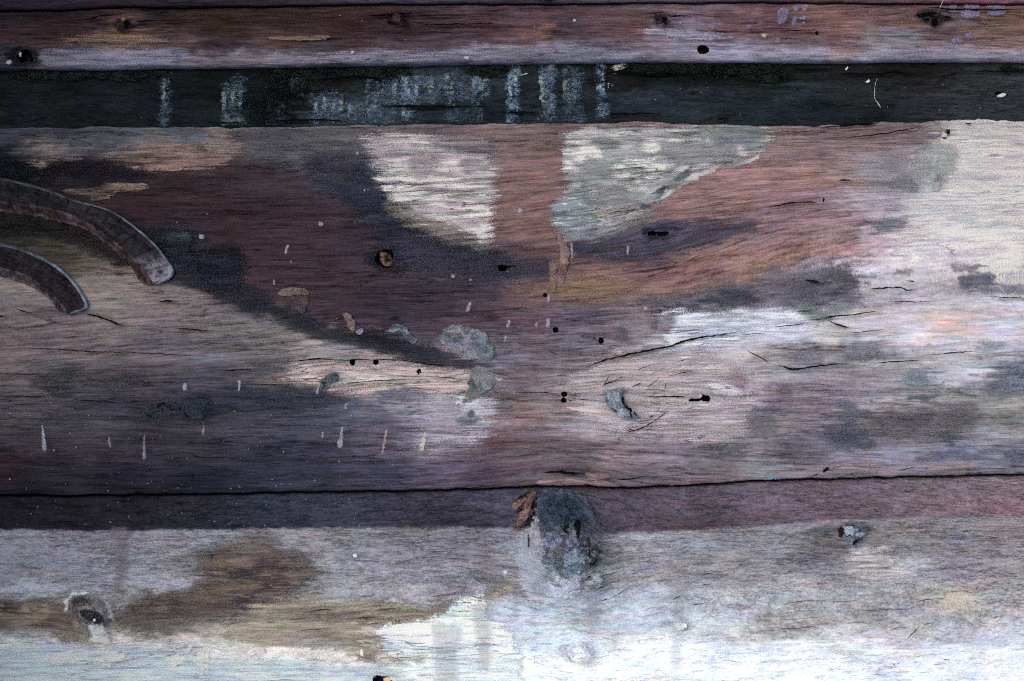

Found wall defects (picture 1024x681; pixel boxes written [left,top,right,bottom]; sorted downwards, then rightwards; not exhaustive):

crack [515,280,931,433]
crack [874,350,977,364]
crack [515,470,584,547]